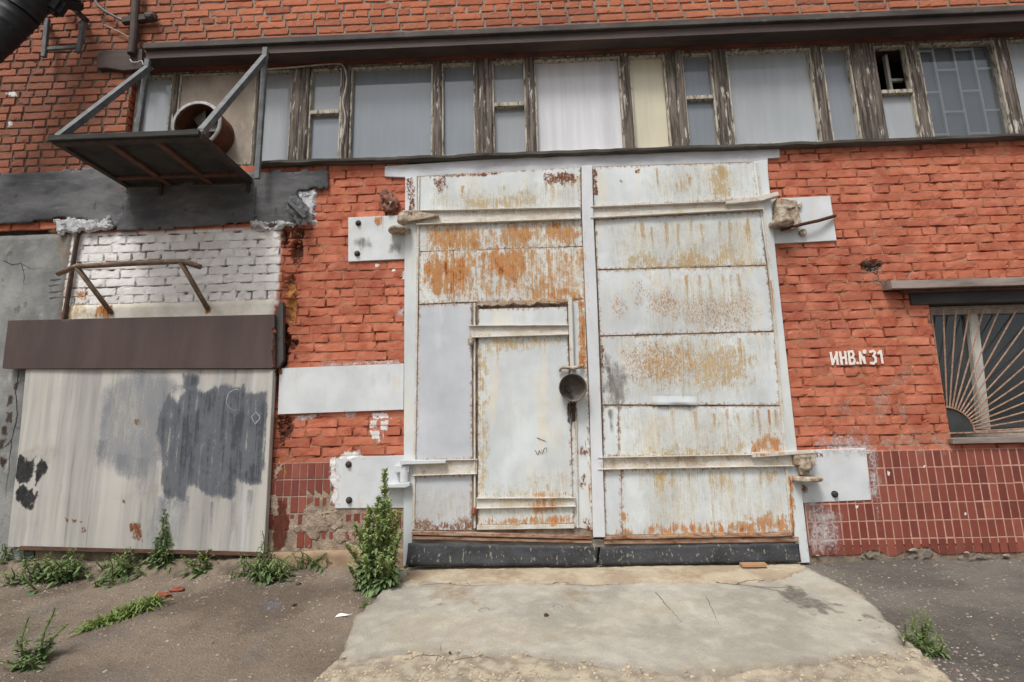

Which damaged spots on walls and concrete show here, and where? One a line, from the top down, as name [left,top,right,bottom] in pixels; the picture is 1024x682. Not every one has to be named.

corrosion [543,171,578,191]
corrosion [413,186,586,532]
corrosion [623,338,755,396]
corrosion [130,522,143,541]
spalling [270,495,279,516]
spalling [291,505,359,548]
corrosion [647,471,808,538]